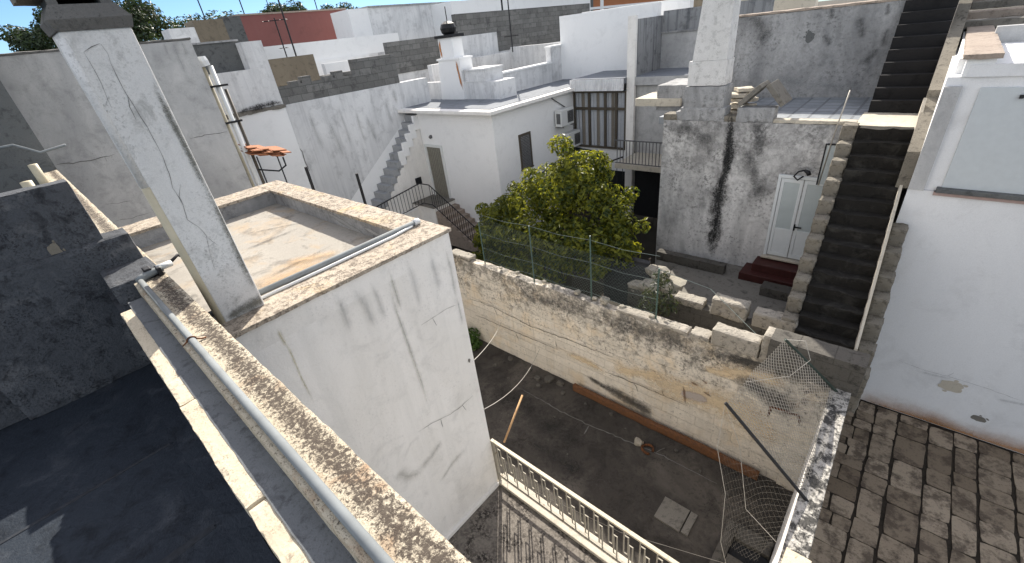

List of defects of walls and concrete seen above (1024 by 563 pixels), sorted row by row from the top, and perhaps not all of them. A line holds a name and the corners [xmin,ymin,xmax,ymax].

crack [84,43,216,266]
leakage [708,117,734,253]
leakage [230,297,262,317]
crack [425,298,685,405]
leakage [590,378,651,414]